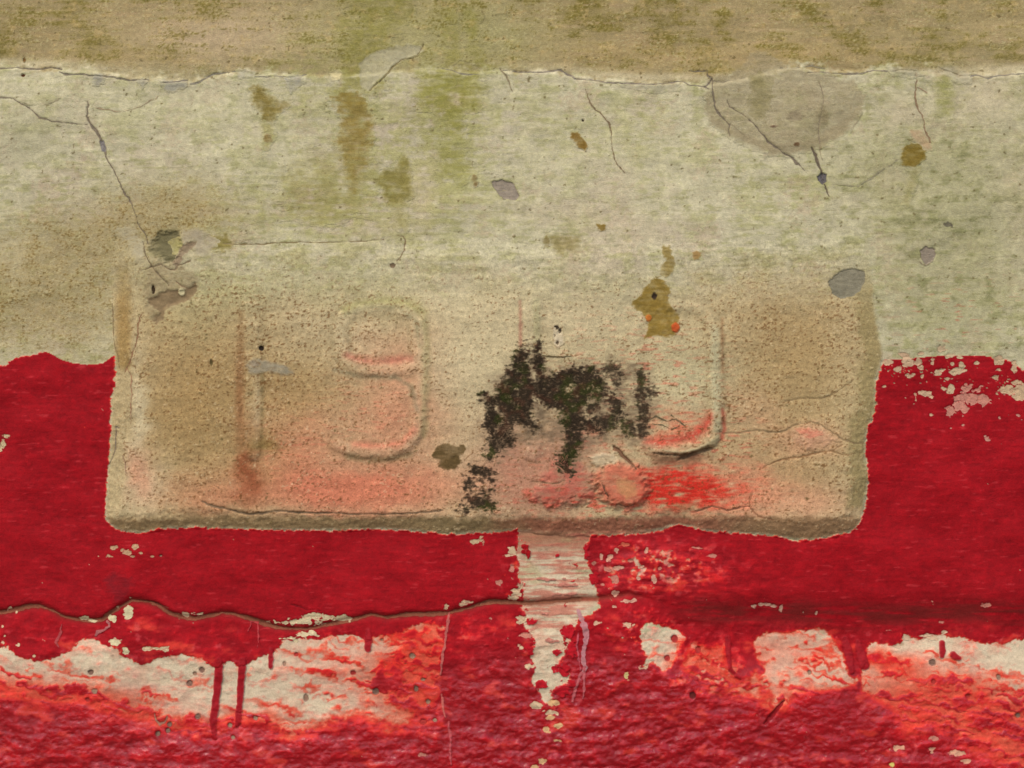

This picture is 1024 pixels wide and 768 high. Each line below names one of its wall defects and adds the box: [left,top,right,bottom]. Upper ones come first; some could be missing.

crack [0,67,307,244]
leakage [248,82,292,152]
leakage [266,86,415,238]
crack [441,62,1024,197]
leakage [701,50,868,158]
spalling [110,223,221,328]
leakage [453,335,685,518]
peeling [882,345,1024,429]
peeling [79,597,134,623]
crack [0,597,582,631]
peeling [266,612,353,643]
peeling [515,612,578,742]